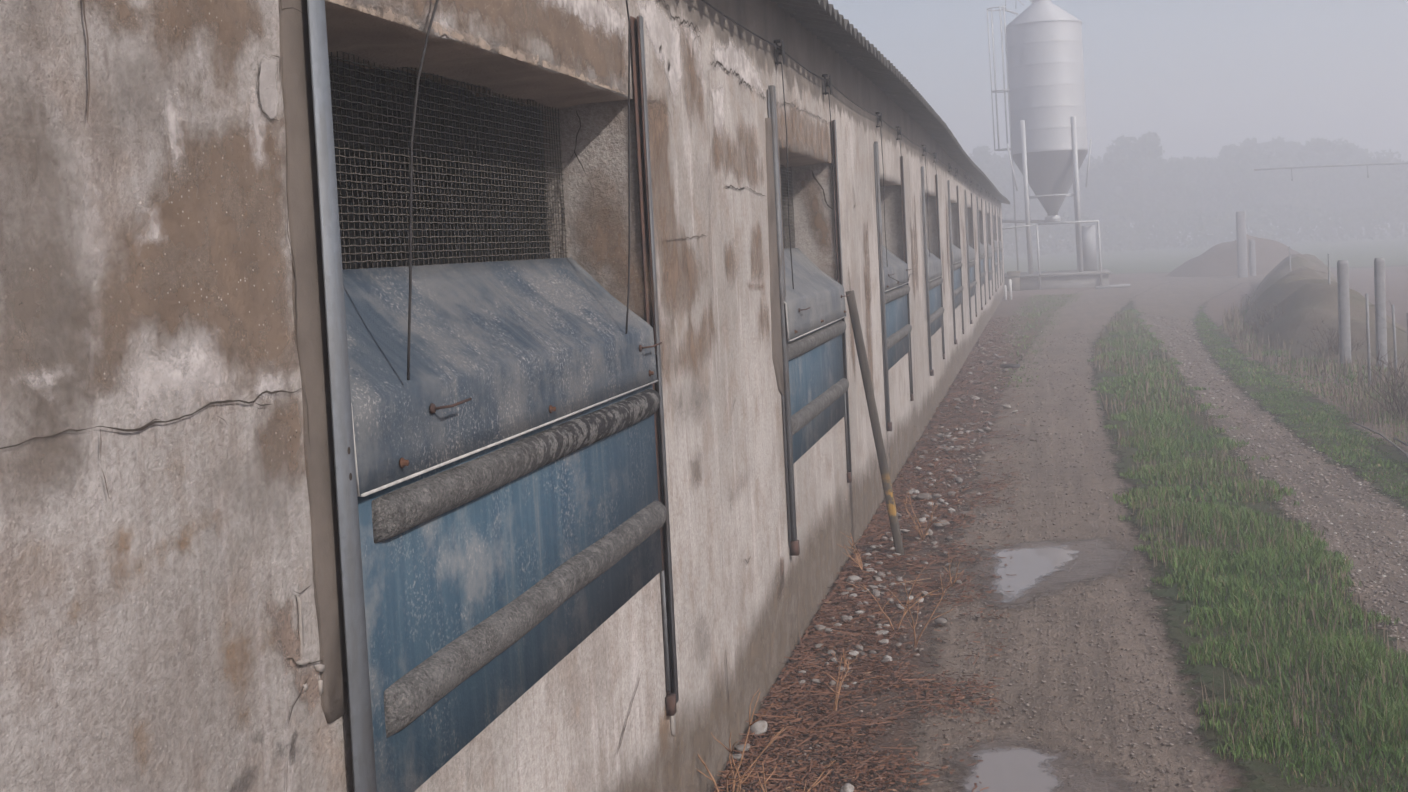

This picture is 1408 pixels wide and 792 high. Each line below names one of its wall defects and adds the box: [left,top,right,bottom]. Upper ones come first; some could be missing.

crack [82,0,90,120]
water stain [0,95,306,481]
crack [0,56,310,497]
water stain [88,0,263,72]
water stain [408,0,765,380]
crack [603,0,848,328]
water stain [619,285,1004,792]